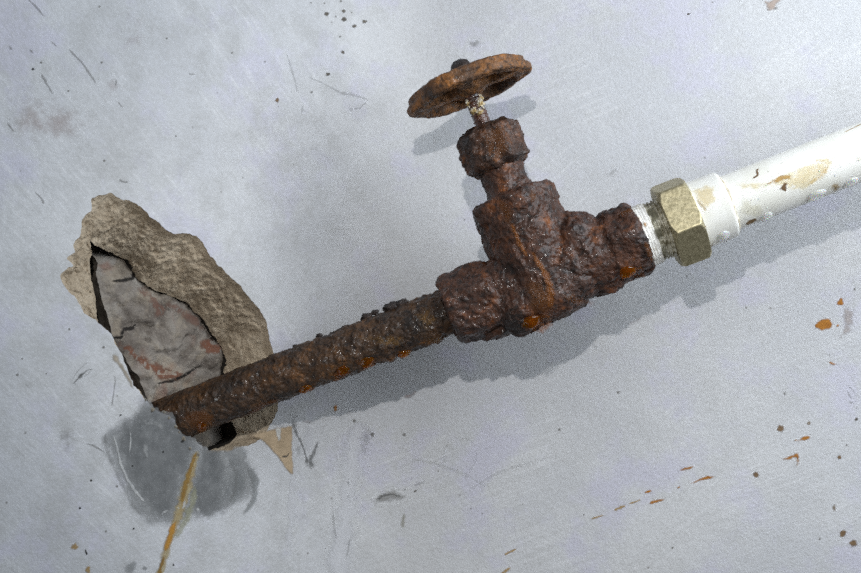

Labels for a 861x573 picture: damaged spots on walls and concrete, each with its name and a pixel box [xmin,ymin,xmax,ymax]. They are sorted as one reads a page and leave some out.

spalling [60,193,293,474]
corrosion [815,319,839,330]
water stain [124,412,192,512]
corrosion [157,453,198,573]